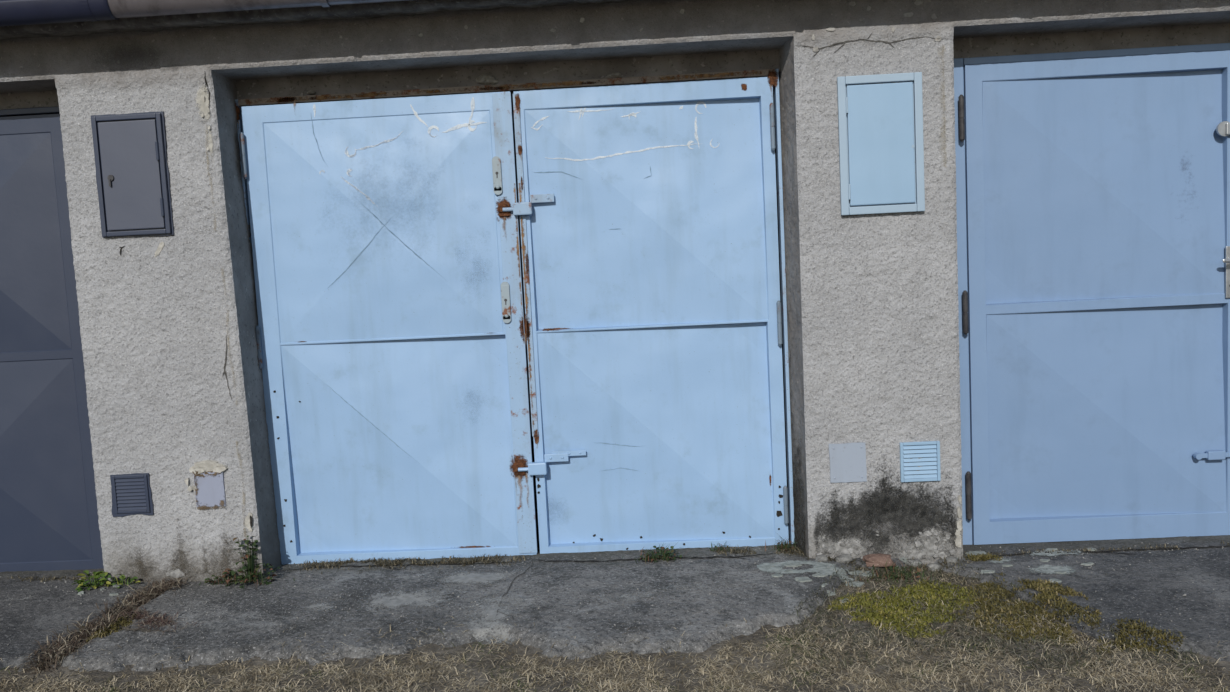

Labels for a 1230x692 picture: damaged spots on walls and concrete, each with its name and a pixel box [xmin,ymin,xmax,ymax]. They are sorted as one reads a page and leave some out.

crack [798,32,947,57]
rust [235,89,446,126]
rust [465,80,600,114]
rust [660,69,778,91]
rust [496,176,569,444]
spalling [185,460,228,492]
rust [510,454,528,498]
water stain [792,449,957,559]